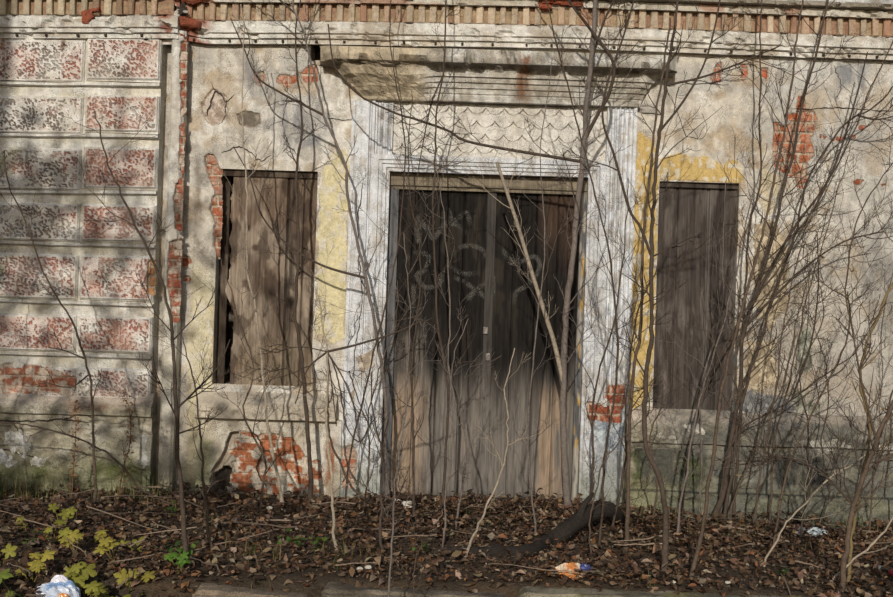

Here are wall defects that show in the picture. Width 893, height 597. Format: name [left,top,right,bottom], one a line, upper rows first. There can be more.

spalling [277,60,334,87]
spalling [168,0,214,393]
spalling [206,149,223,259]
peeling [586,132,743,452]
peeling [735,96,868,415]
spalling [0,359,76,396]
spalling [226,427,327,496]